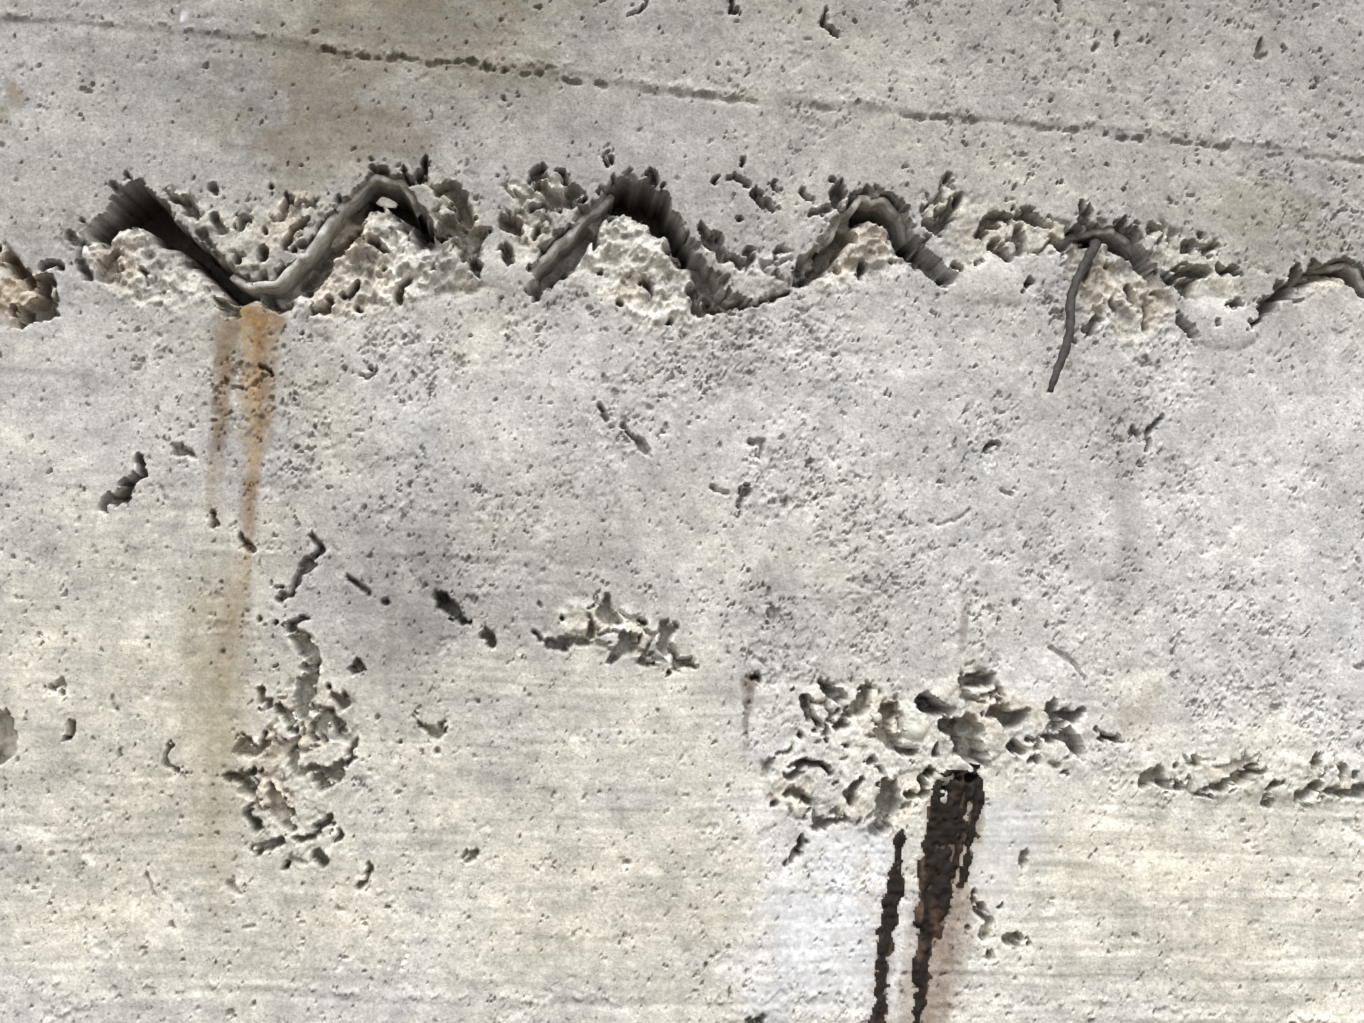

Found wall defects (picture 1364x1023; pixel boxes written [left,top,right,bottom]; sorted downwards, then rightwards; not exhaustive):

rust [216,306,280,517]
spalling [0,155,500,333]
spalling [257,363,276,380]
spalling [356,363,380,381]
spalling [521,166,959,347]
spalling [1056,215,1179,348]
spalling [1246,256,1364,331]
hole [756,665,1125,868]
water stain [745,763,1045,1023]
hole [1017,847,1031,872]